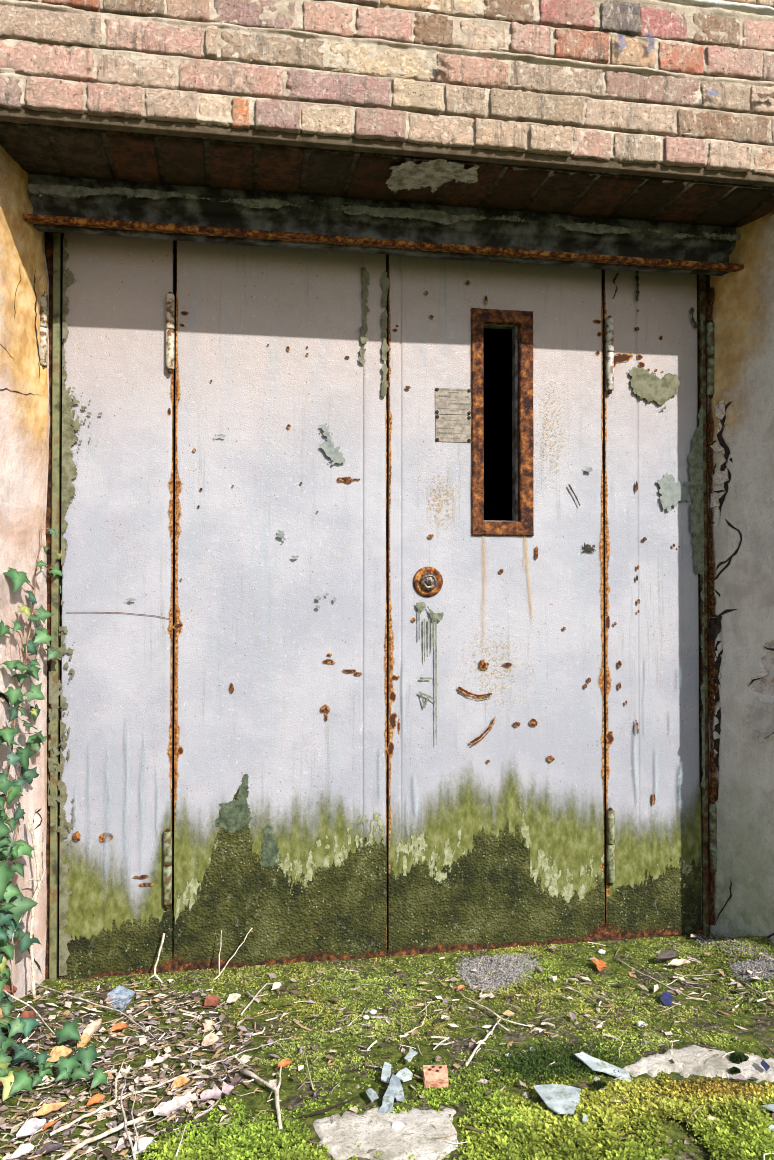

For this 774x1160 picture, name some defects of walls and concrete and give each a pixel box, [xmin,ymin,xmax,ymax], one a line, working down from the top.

crack [0,270,40,395]
leakage [0,144,48,440]
peeling [628,367,680,410]
peeling [656,404,704,658]
rust [707,399,719,804]
crack [707,400,742,799]
spalling [746,640,774,696]